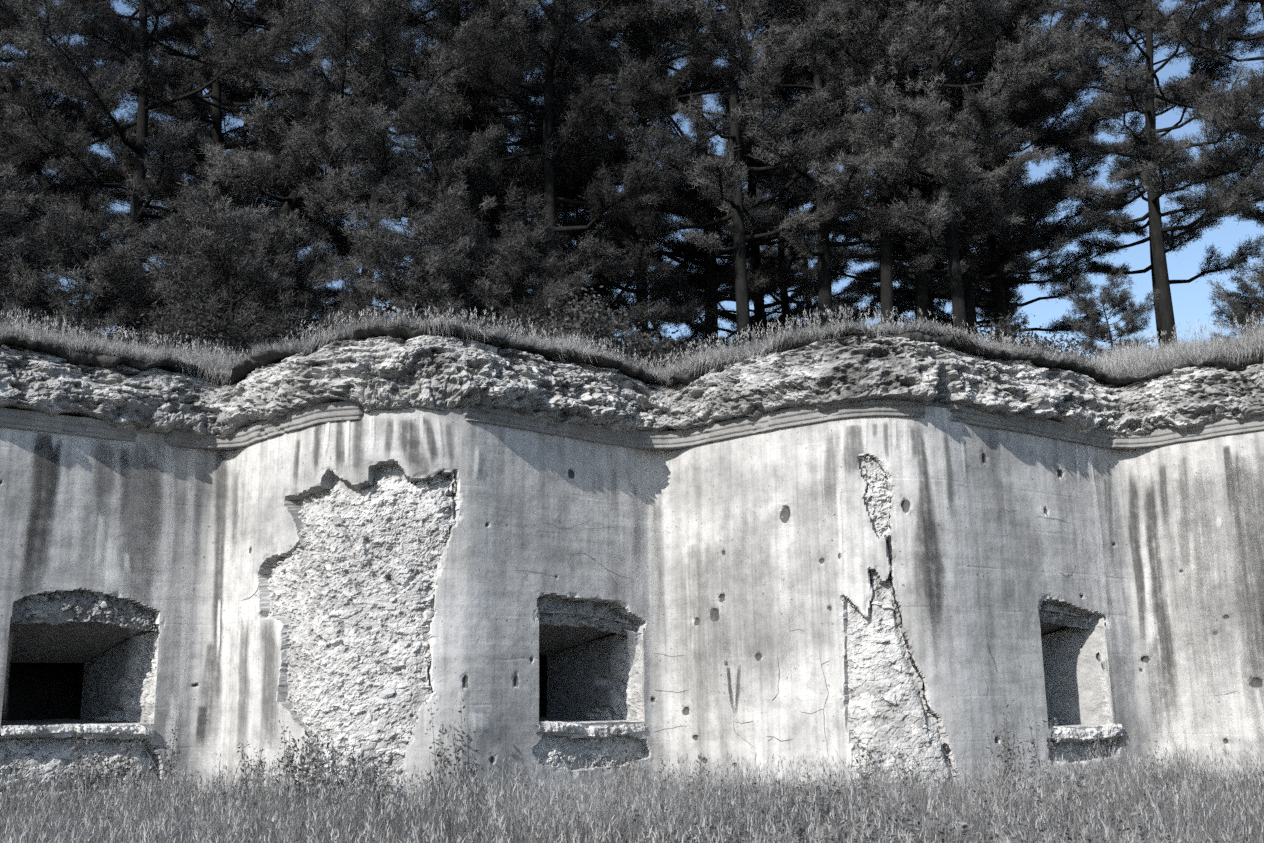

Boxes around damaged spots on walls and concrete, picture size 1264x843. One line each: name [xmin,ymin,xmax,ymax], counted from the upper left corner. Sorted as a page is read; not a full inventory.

spalling [0,334,1264,439]
leakage [22,435,60,582]
spalling [10,590,159,632]
leakage [96,453,154,590]
spalling [266,465,456,799]
spalling [859,455,910,539]
spalling [847,572,952,793]
crack [844,458,956,773]
leakage [1129,470,1174,686]
leakage [1224,447,1263,564]
spalling [0,737,160,797]
spalling [532,736,646,770]